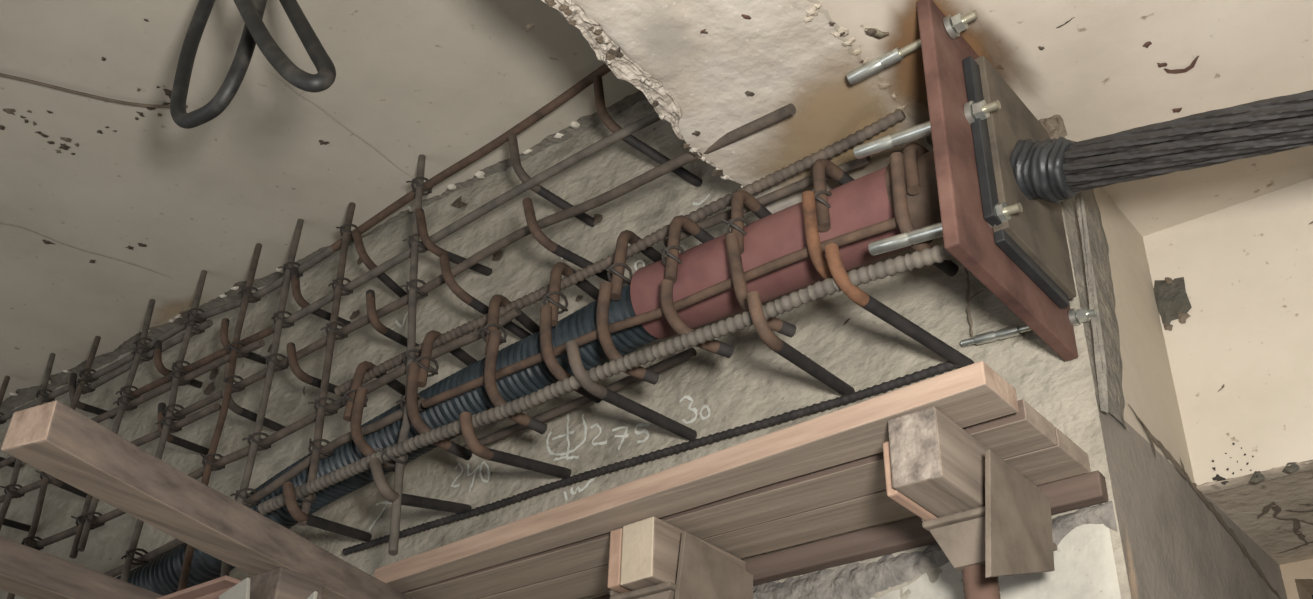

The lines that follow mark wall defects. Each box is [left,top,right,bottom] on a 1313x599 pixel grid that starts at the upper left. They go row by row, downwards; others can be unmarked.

rust [888,0,957,111]
rust [960,27,1018,77]
flaking render [0,0,745,416]
flaking render [1154,277,1192,331]
crack [1128,404,1313,599]
flaking render [1196,460,1313,495]